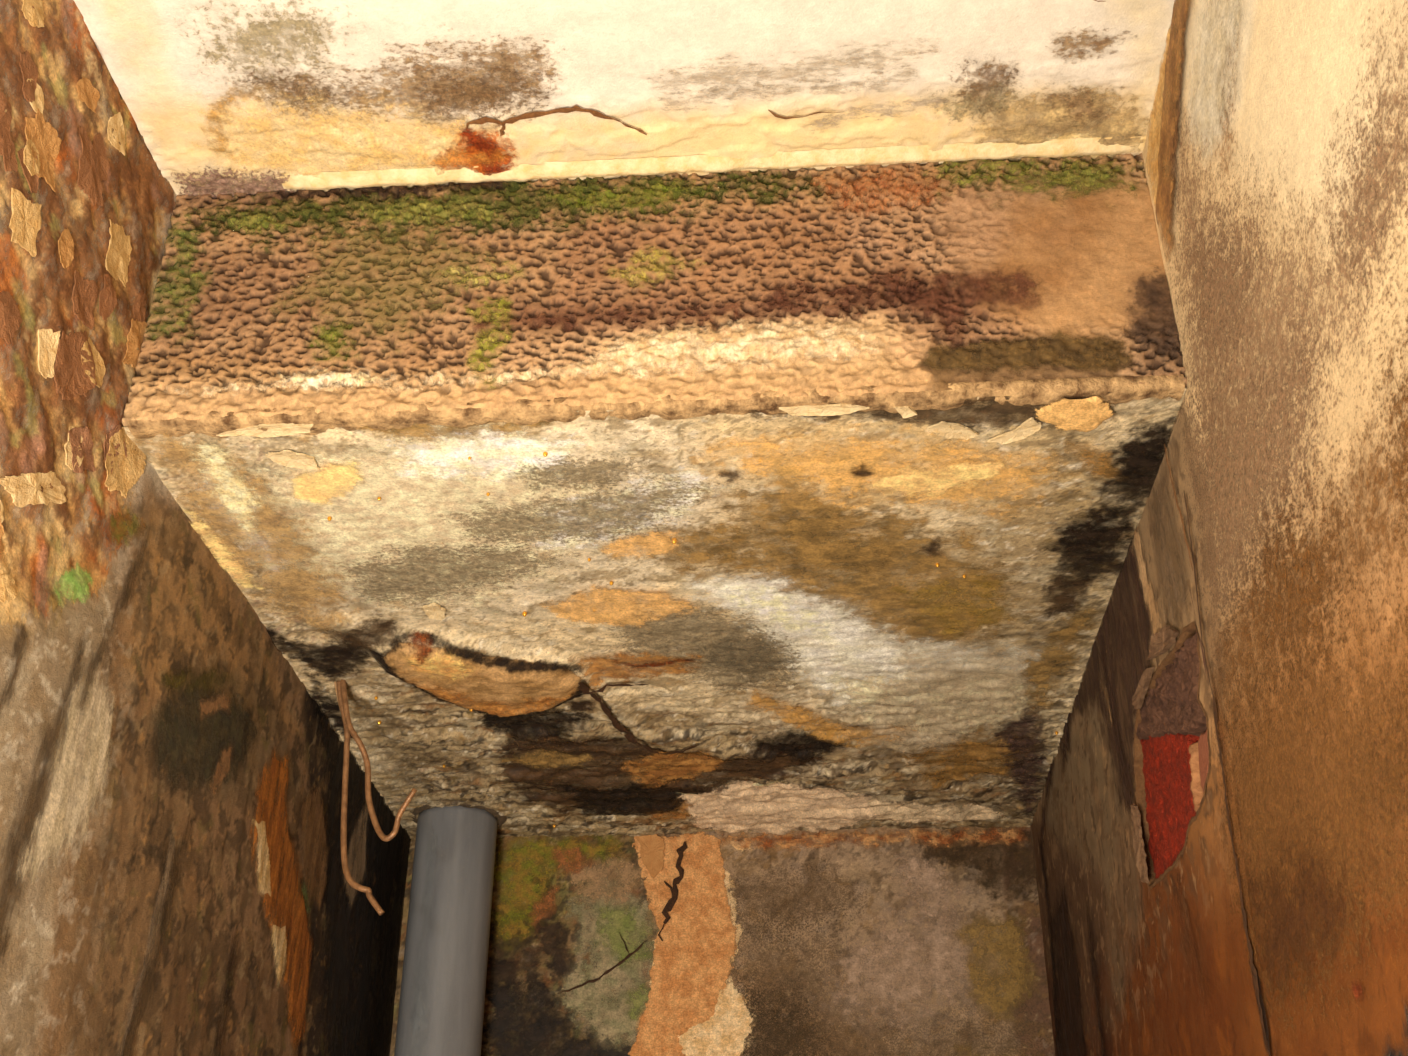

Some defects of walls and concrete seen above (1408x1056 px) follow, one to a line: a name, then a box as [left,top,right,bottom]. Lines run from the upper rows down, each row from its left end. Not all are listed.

damp [198,0,558,201]
rust [432,128,517,184]
crack [466,105,647,136]
spalling [0,0,1240,628]
damp [475,273,1132,385]
damp [610,27,1408,1056]
damp [154,421,739,1056]
crack [558,842,688,994]
crack [578,682,699,755]
peeling [490,729,1003,1056]
spalling [1130,590,1211,890]
crack [1164,444,1271,1056]